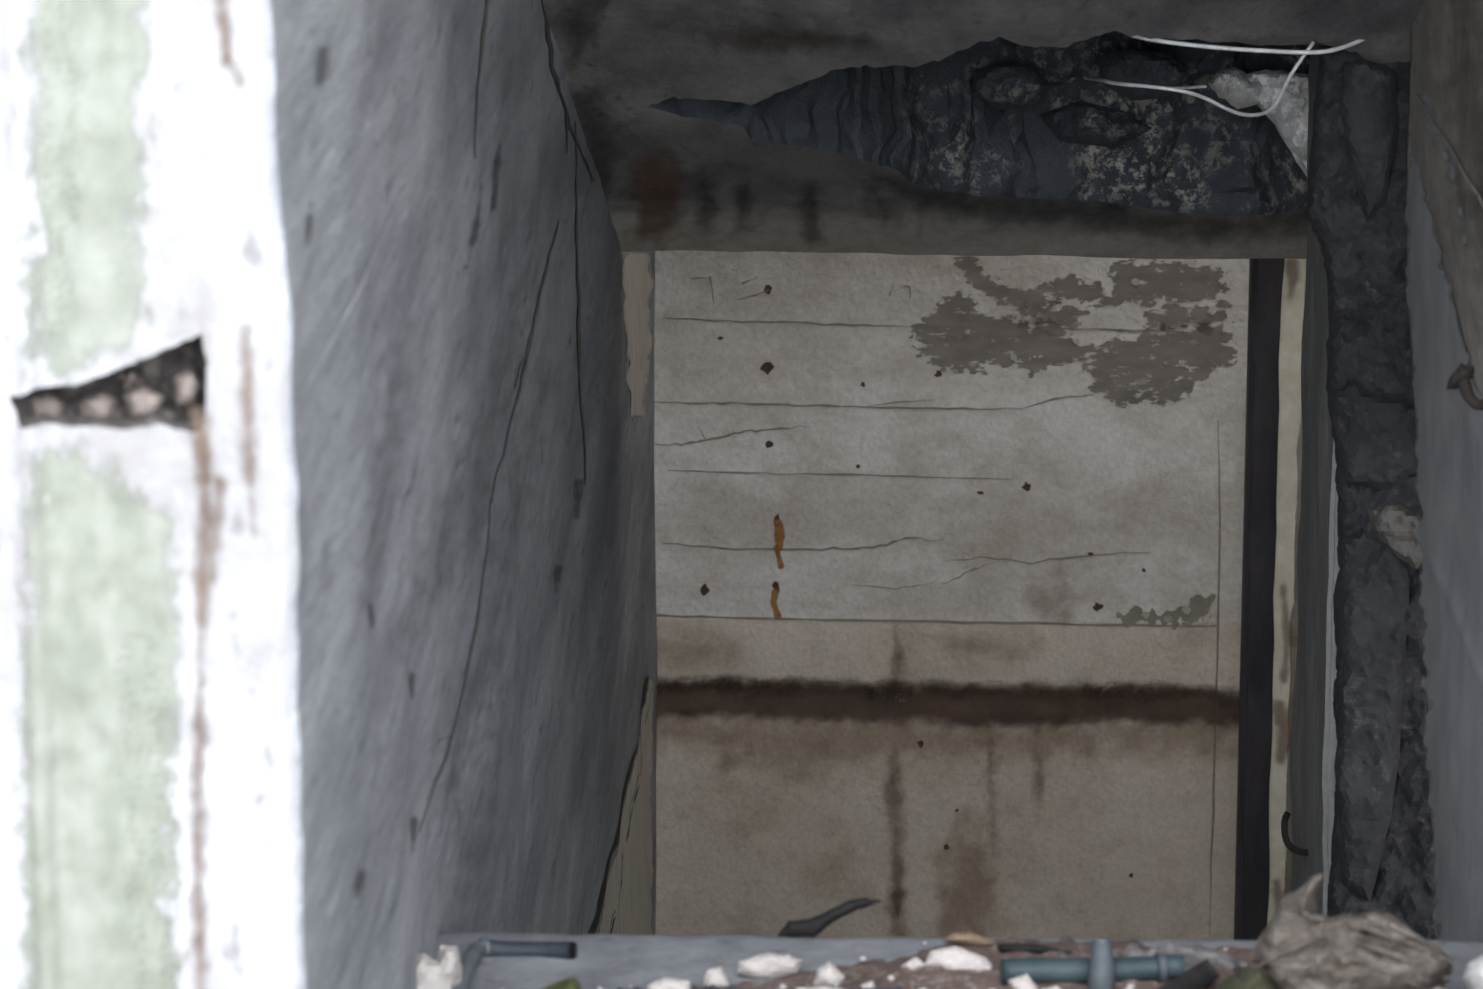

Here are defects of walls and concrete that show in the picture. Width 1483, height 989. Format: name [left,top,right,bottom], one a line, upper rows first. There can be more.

spalling [647,31,1483,942]
rust [774,520,785,569]
rust [771,589,781,619]
water stain [657,679,1239,726]